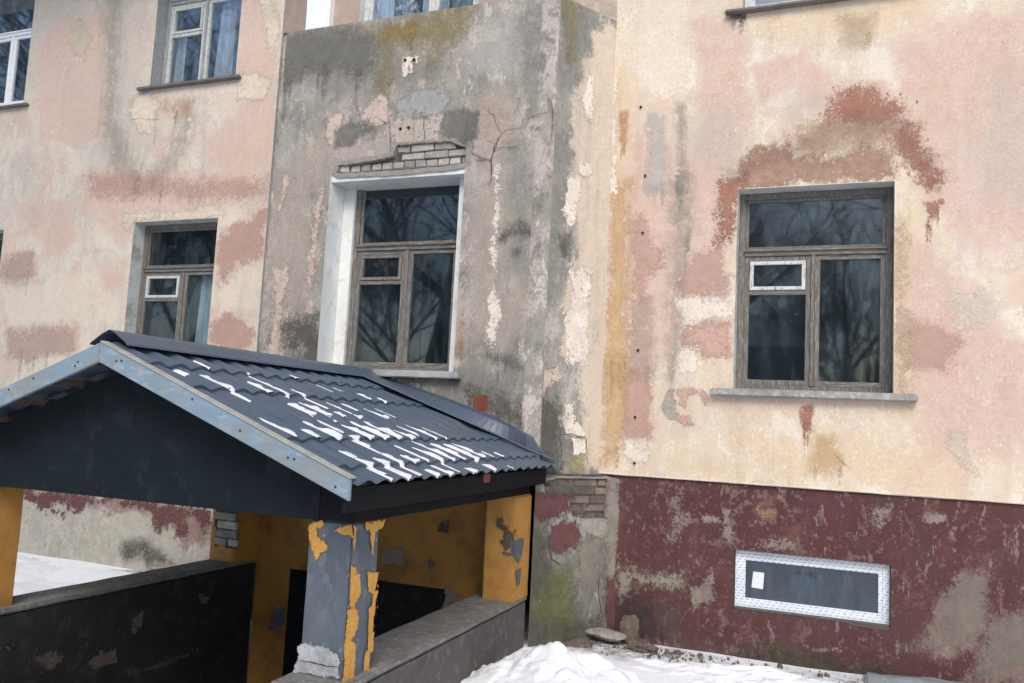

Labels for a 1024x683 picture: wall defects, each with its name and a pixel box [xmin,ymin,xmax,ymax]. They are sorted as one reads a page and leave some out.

leakage [282,26,377,101]
crack [469,106,559,186]
peeling [119,169,291,283]
flaking render [333,96,517,352]
peeling [561,162,593,229]
peeling [617,81,944,469]
peeling [24,489,239,549]
peeling [535,474,612,555]
peeling [663,492,736,548]
peeling [293,519,405,682]
leakage [529,598,663,647]
peeling [602,563,718,630]